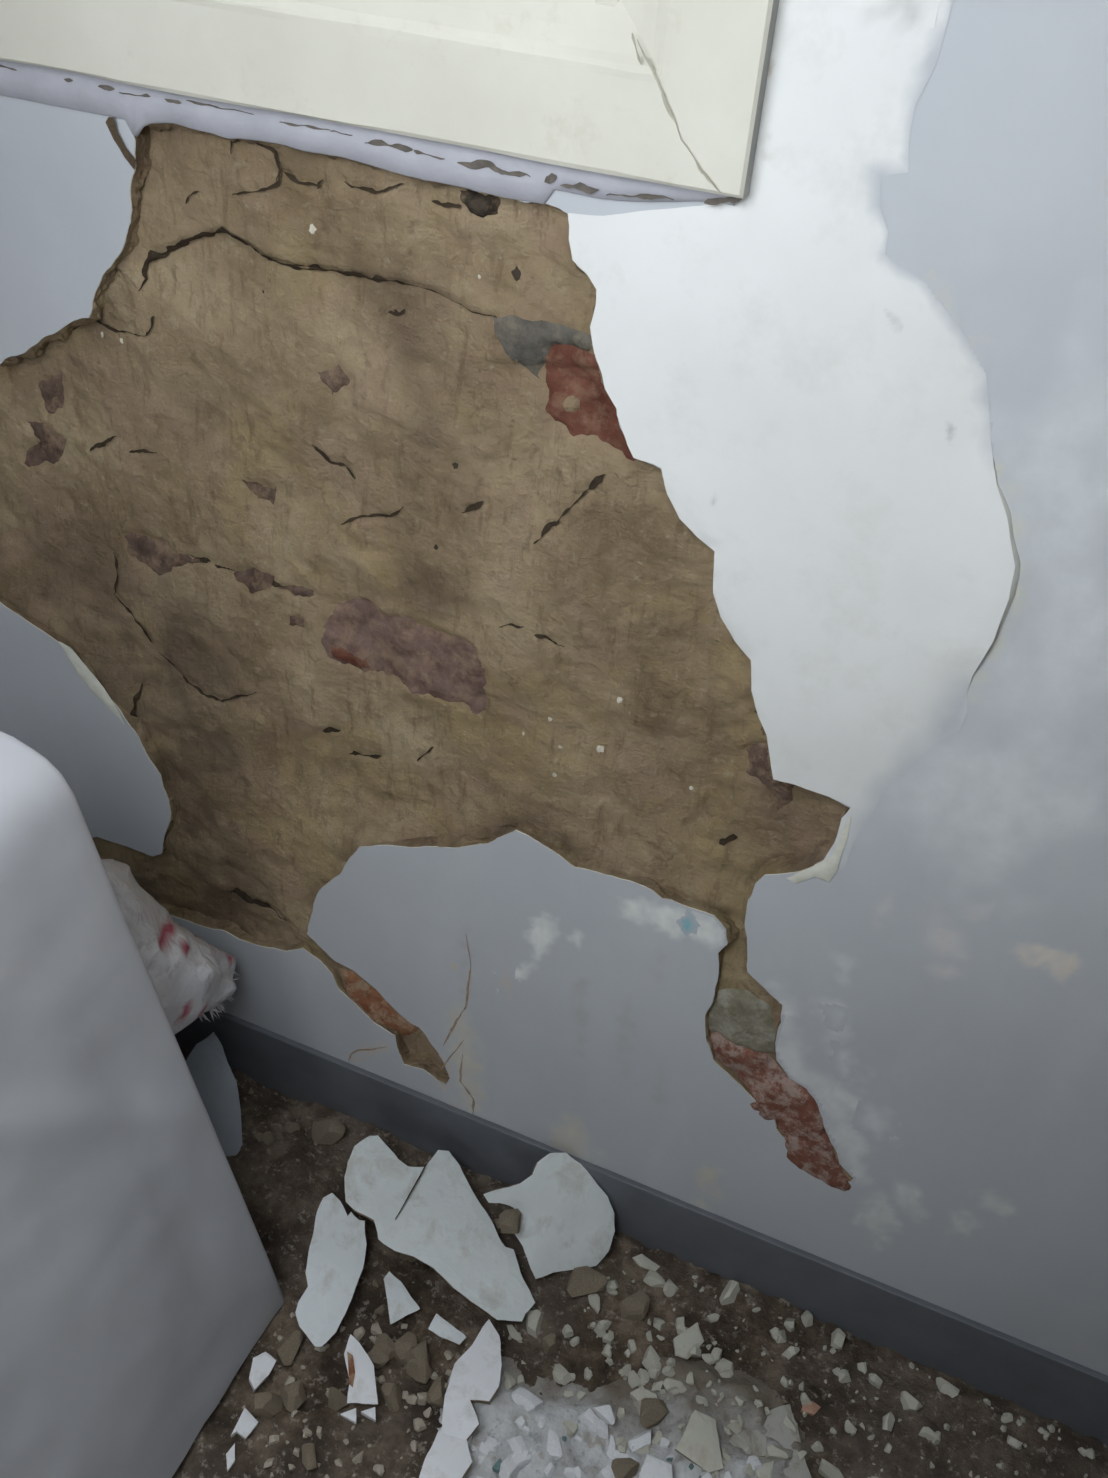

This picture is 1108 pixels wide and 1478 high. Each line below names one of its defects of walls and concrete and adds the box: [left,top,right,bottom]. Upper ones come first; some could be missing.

crack [64,33,742,337]
spalling [0,0,1021,1101]
rust [344,1036,397,1068]
crack [341,934,475,1115]